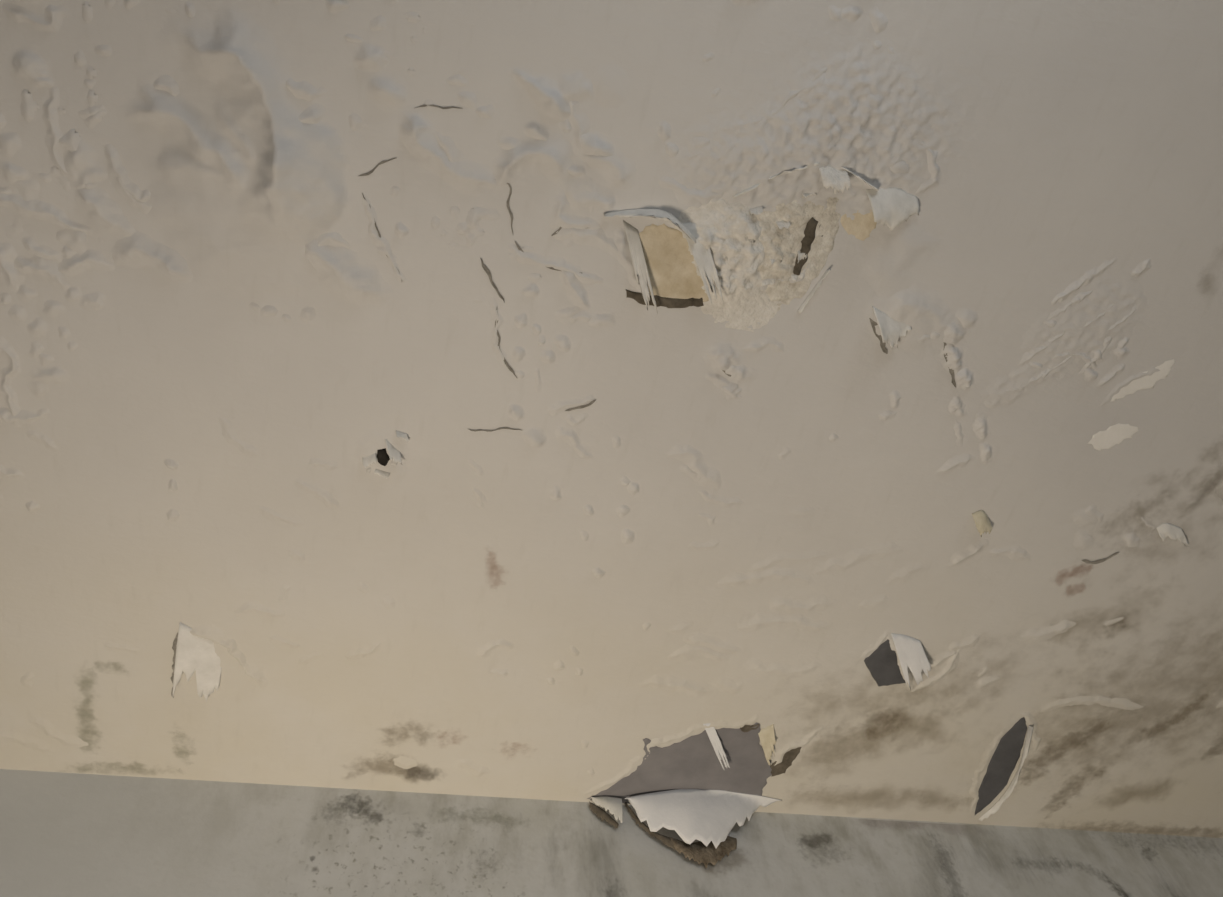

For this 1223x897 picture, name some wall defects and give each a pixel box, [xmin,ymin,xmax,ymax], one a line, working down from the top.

peeling [603,5,1010,332]
peeling [1088,423,1138,451]
peeling [1100,359,1175,406]
peeling [858,629,962,694]
peeling [583,713,827,869]
peeling [969,711,1043,821]